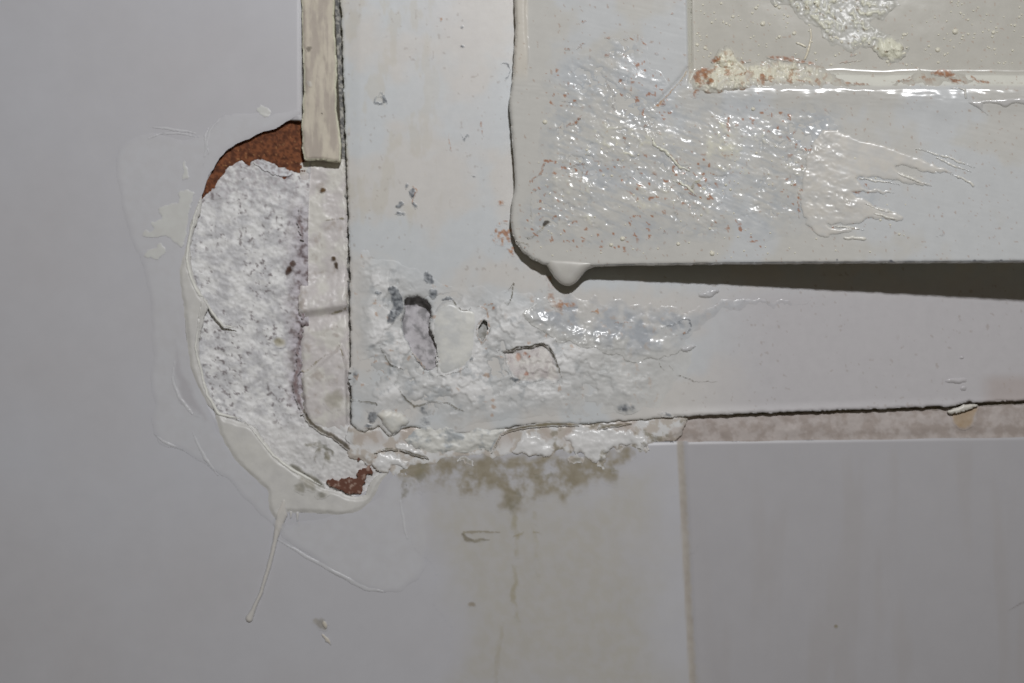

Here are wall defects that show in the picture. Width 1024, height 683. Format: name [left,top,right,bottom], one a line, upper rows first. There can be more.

peeling [395,182,418,216]
rust [490,220,516,257]
spalling [180,112,388,518]
peeling [374,285,404,324]
peeling [423,271,477,373]
crack [496,343,563,379]
peeling [614,402,638,415]
crack [687,401,1024,419]
damp [395,441,712,683]